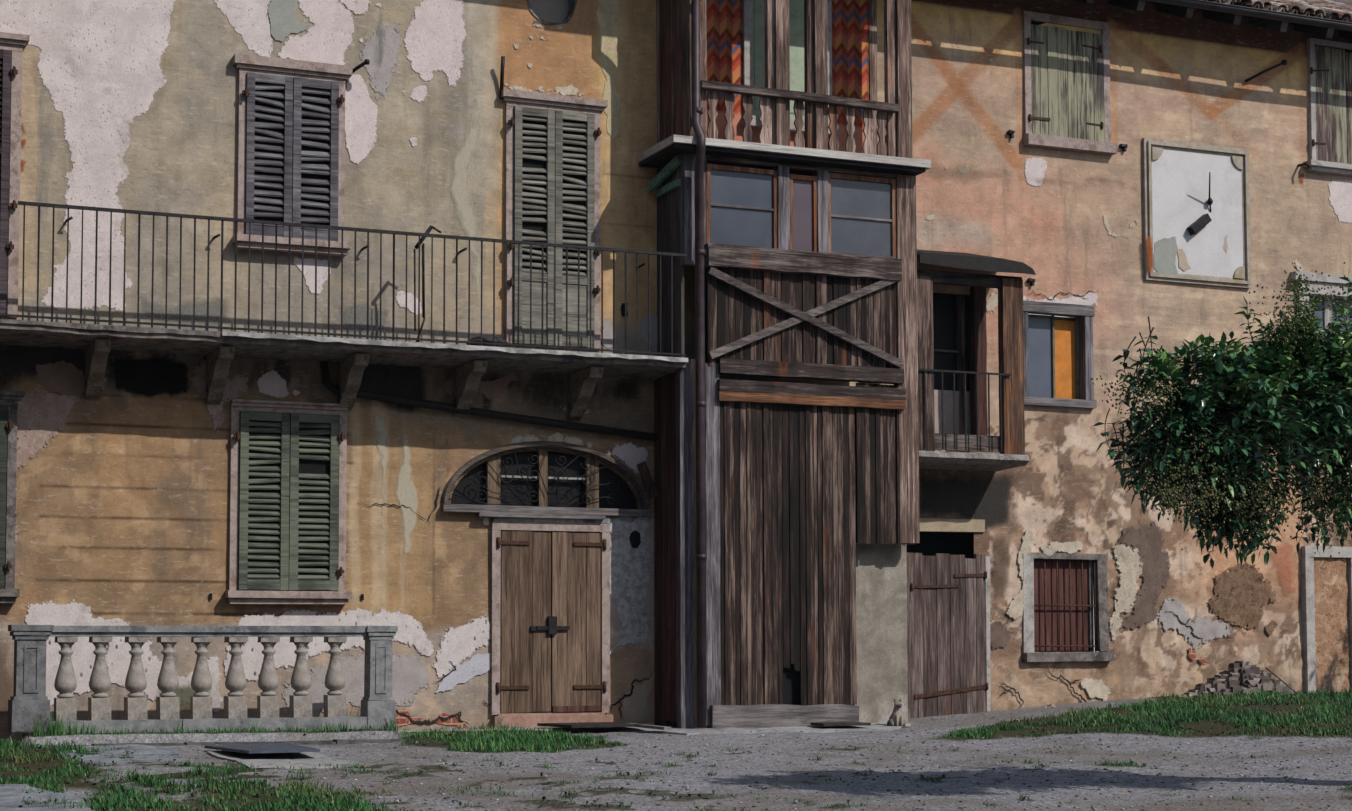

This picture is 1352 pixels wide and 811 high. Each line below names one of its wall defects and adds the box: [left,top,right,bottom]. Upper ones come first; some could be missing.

peeling [214,0,467,164]
peeling [0,0,175,311]
peeling [1328,180,1352,223]
peeling [291,256,331,294]
peeling [396,290,422,315]
spalling [192,355,300,433]
peeling [610,516,652,654]
spalling [1109,521,1278,664]
peeling [22,600,162,707]
peeling [178,594,491,728]
crack [608,673,652,719]